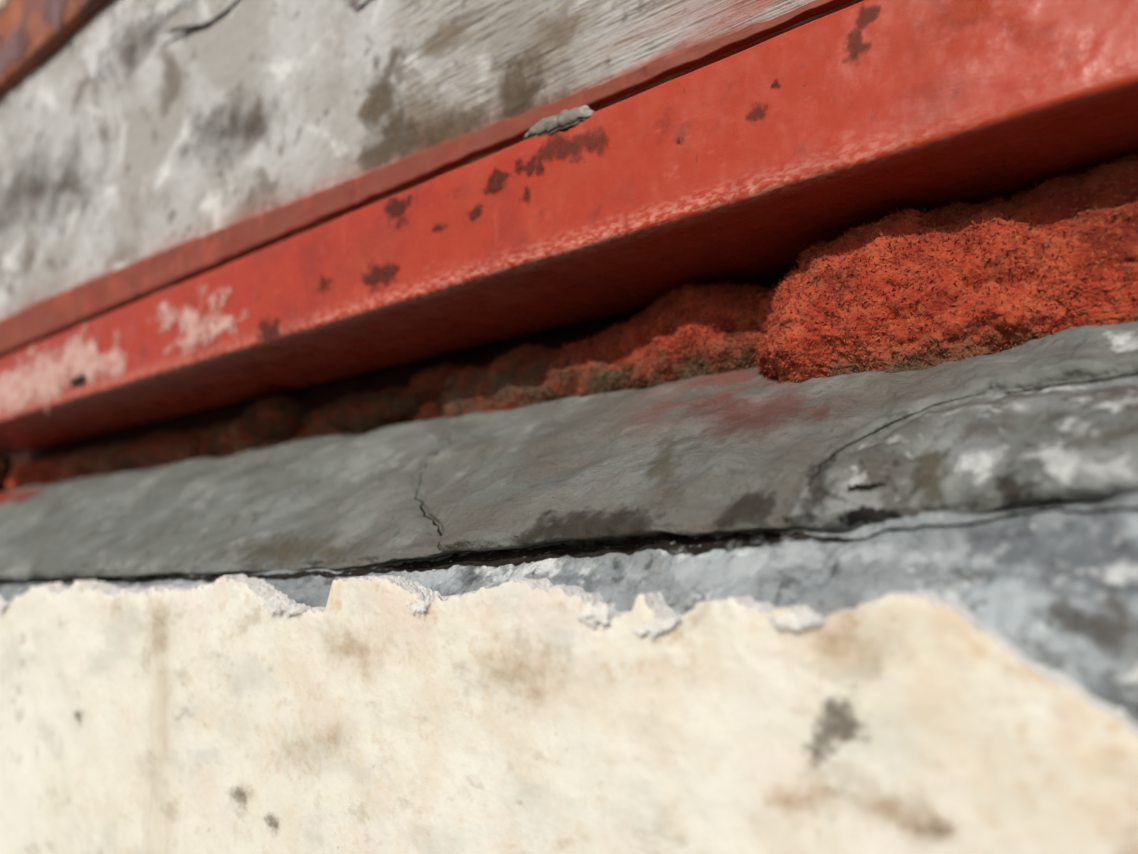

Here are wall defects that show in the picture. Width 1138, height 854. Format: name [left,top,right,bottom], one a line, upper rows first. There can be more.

peeling [144,0,193,28]
peeling [160,289,245,351]
peeling [0,333,125,413]
crack [0,433,1138,585]
peeling [0,493,1138,735]
damp [1120,666,1138,686]